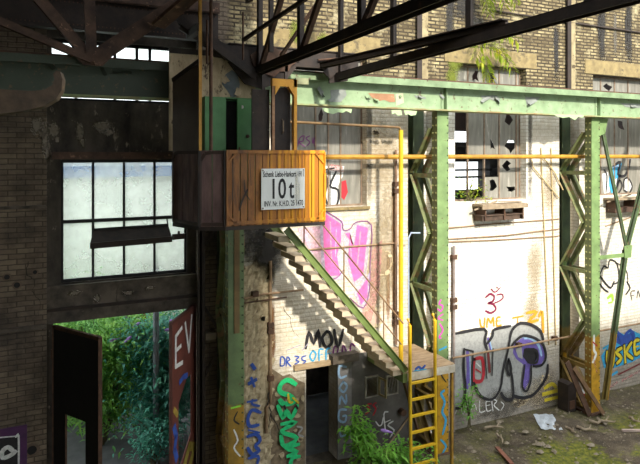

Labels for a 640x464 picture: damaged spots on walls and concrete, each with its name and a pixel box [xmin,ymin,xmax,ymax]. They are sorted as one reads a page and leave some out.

peeling [317,86,352,114]
peeling [365,93,417,116]
damp [529,250,539,289]